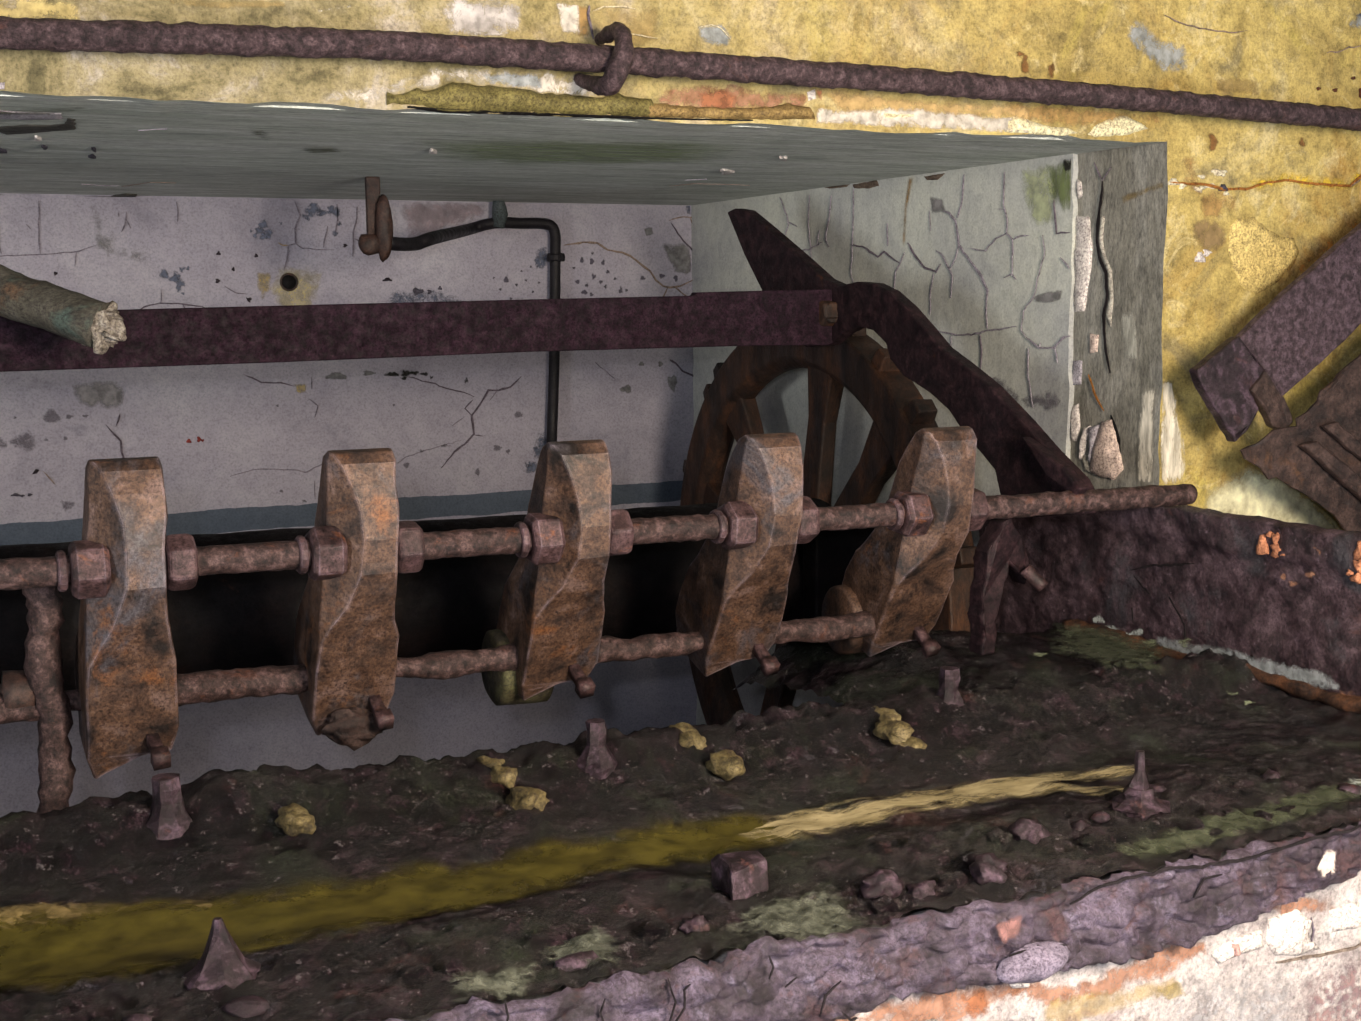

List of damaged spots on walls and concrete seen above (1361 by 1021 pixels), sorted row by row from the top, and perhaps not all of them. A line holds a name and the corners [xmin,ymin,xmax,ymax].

crack [1170,175,1361,191]
crack [565,162,1114,407]
peeling [1035,215,1093,312]
crack [106,414,125,458]
crack [396,377,521,468]
corrosion [1256,531,1285,558]
corrosion [1346,541,1361,584]
corrosion [1318,852,1335,876]
peeling [1210,909,1320,964]
corrosion [1276,898,1333,915]
peeling [1329,898,1361,932]
corrosion [835,919,1205,1021]